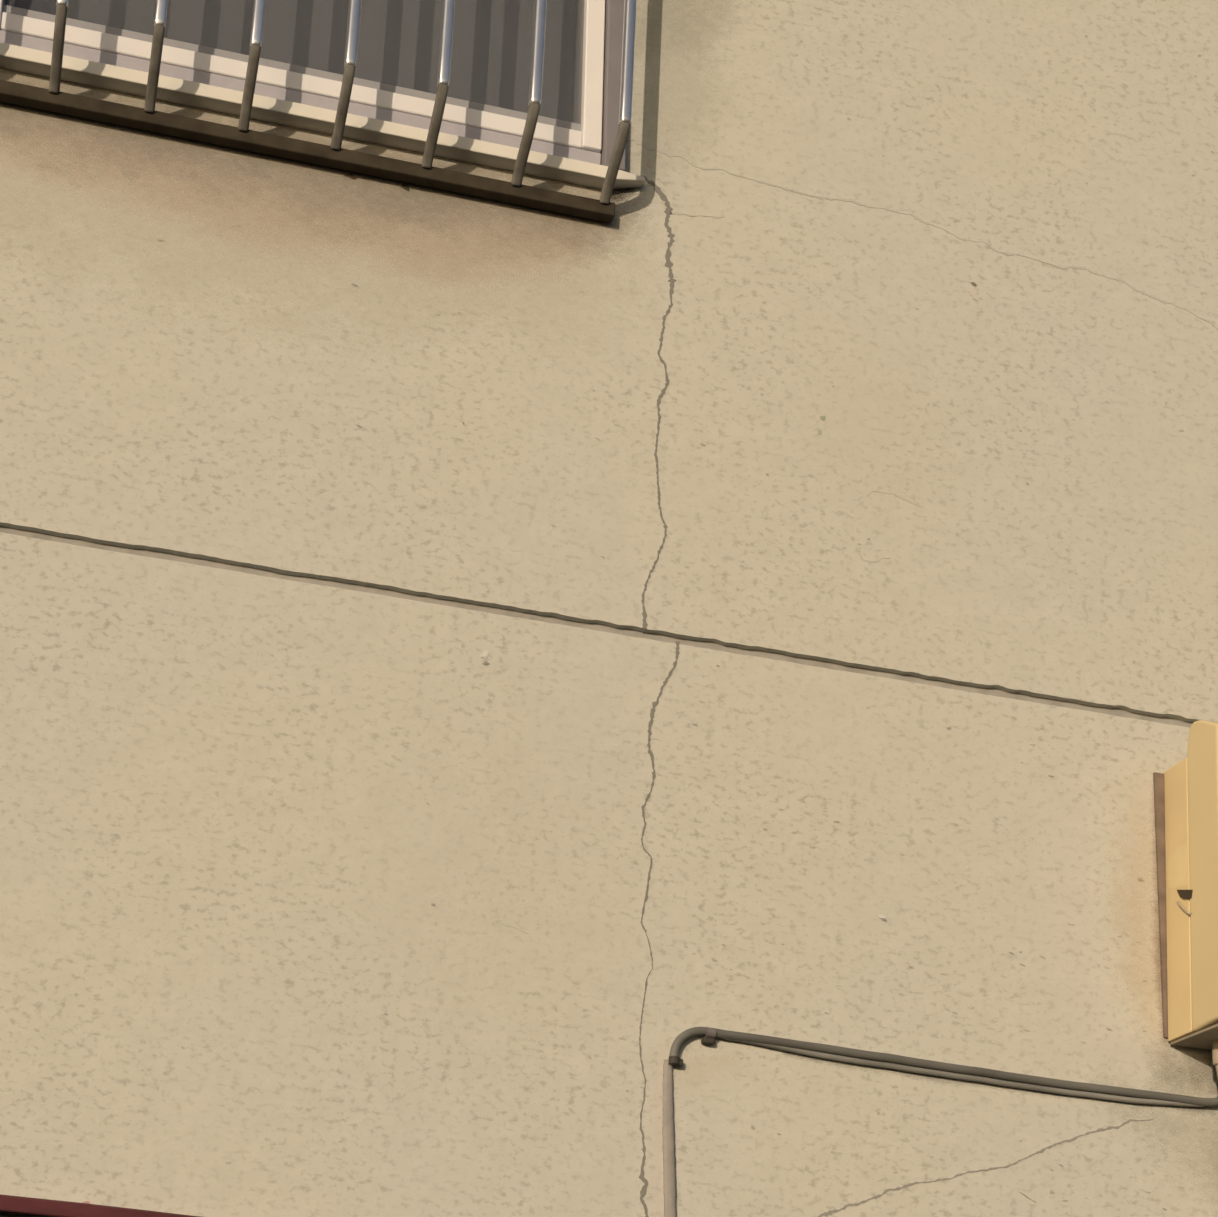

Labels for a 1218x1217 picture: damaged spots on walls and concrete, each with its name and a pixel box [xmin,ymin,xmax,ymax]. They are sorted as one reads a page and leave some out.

crack [627,137,1218,629]
crack [635,641,680,1217]
crack [818,1119,1154,1217]